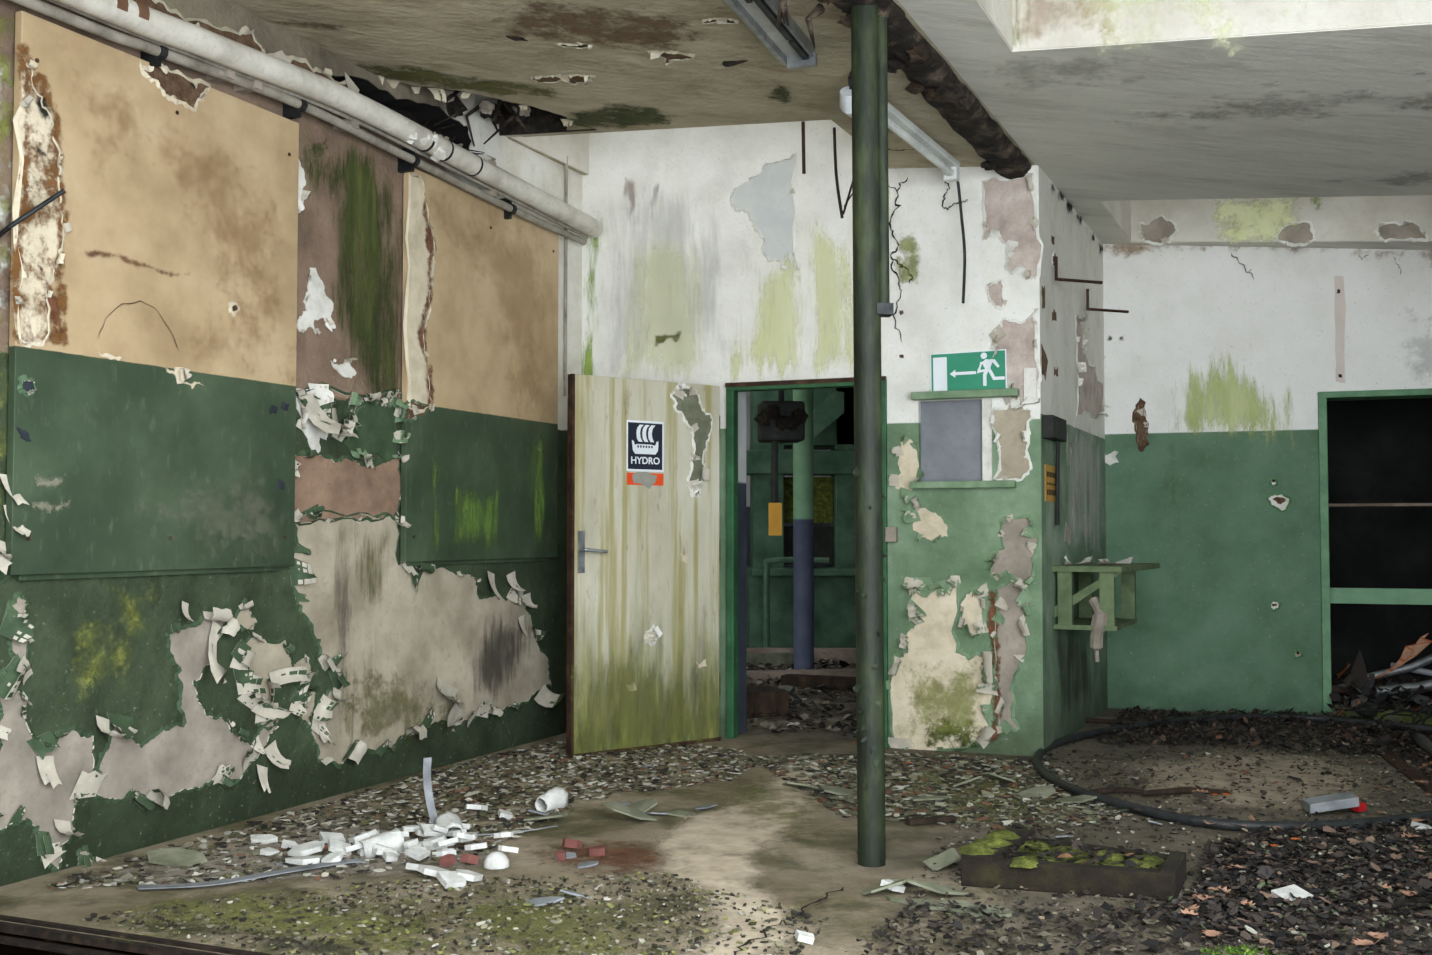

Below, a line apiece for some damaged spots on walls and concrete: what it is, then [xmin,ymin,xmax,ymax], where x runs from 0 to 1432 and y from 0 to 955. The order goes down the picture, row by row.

spalling [139,0,496,165]
spalling [529,74,597,85]
damp [494,3,696,49]
peeling [12,60,72,348]
spalling [1138,214,1179,246]
spalling [1275,221,1316,247]
spalling [1374,220,1428,243]
spalling [982,173,1058,482]
peeling [0,173,564,873]
peeling [889,435,948,542]
peeling [886,512,1039,751]